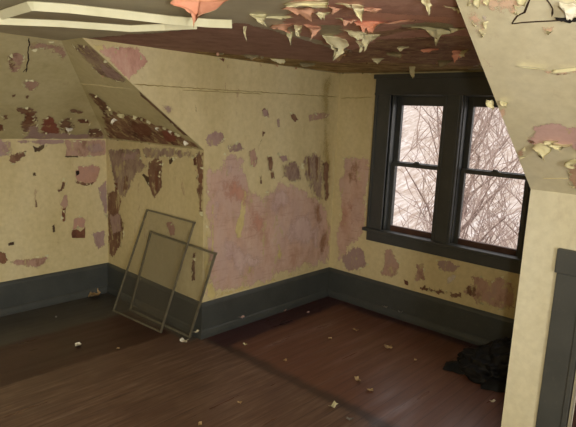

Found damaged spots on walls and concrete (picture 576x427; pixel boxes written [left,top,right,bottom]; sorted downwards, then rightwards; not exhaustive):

peeling [554,2,576,23]
peeling [71,0,527,82]
peeling [486,100,508,117]
peeling [518,123,576,161]
peeling [0,92,370,299]
peeling [380,247,400,277]
peeling [404,264,515,310]